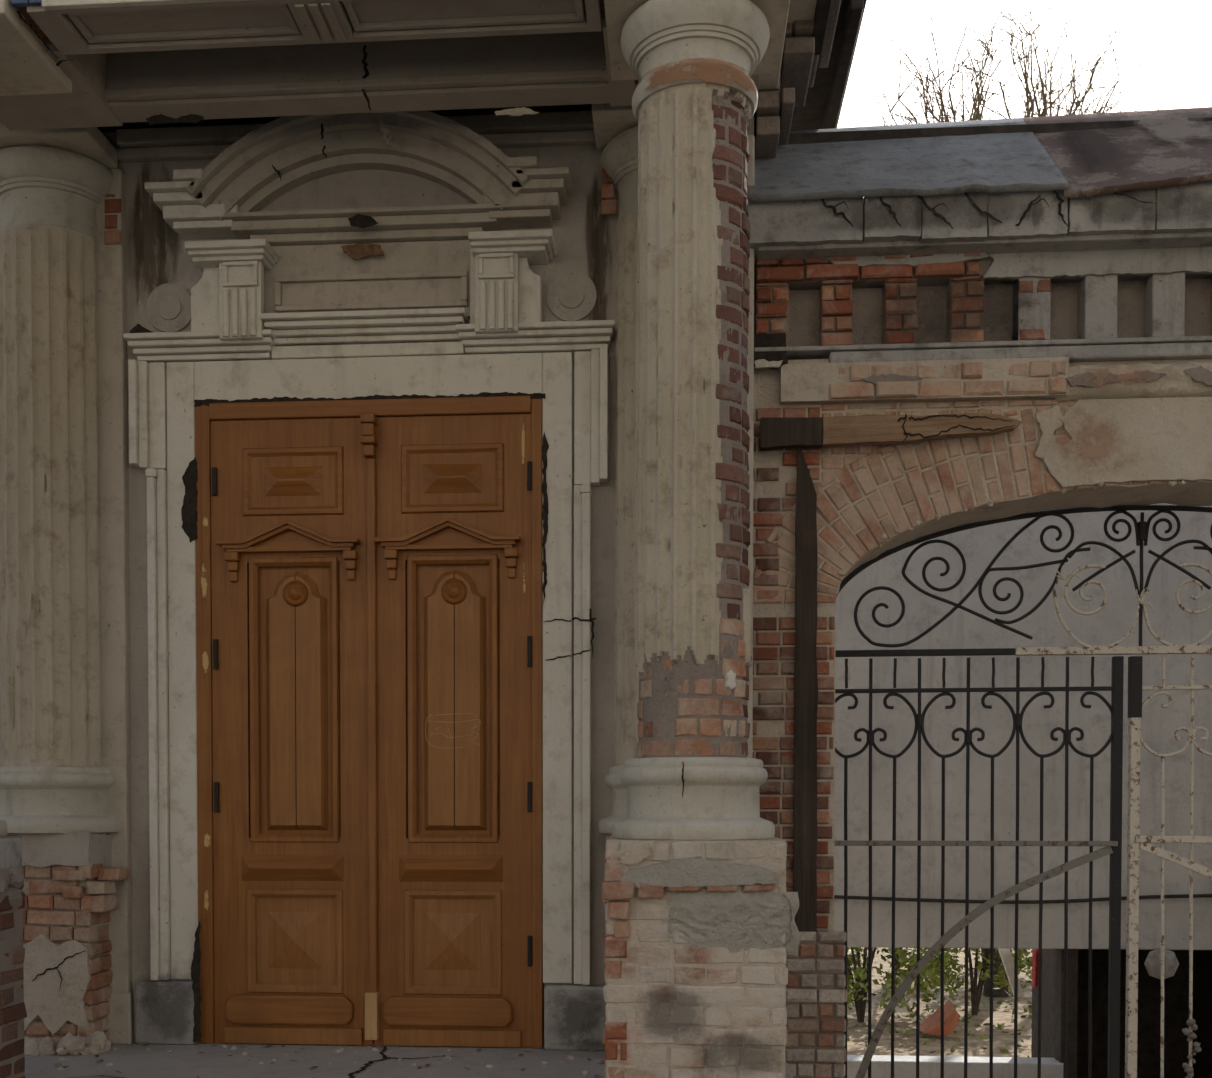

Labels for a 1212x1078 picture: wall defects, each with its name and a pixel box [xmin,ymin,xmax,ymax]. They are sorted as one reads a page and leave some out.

crack [361,45,392,145]
spalling [646,58,757,90]
crack [320,123,328,158]
flaking render [348,214,379,228]
crack [821,199,853,227]
crack [880,190,1069,229]
flaking render [637,100,750,758]
flaking render [181,456,198,543]
crack [545,609,596,661]
spalling [602,879,774,978]
crack [348,1046,452,1078]
flaking render [605,1021,627,1078]